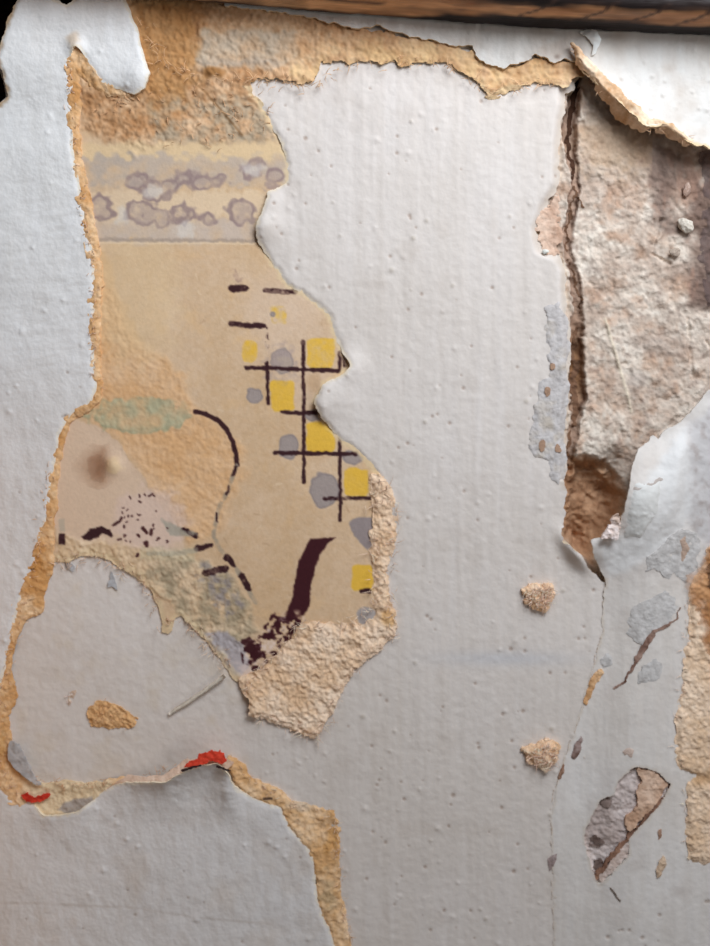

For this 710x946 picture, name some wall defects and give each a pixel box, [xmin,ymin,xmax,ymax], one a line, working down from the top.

peeling [0,0,335,946]
flaking render [224,3,710,583]
peeling [584,747,670,883]